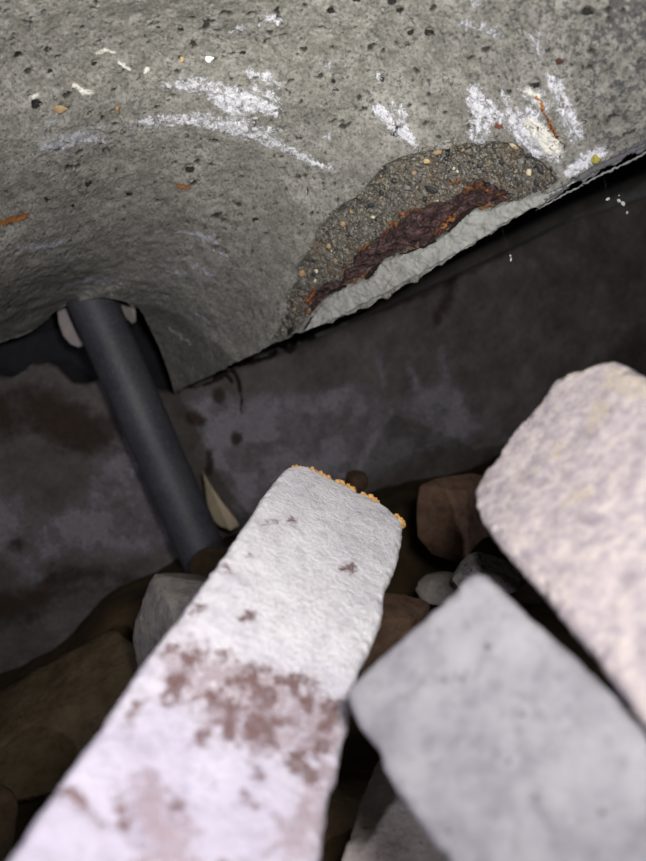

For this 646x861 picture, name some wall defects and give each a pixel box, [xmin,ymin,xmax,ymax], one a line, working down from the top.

efflorescence [465,73,608,179]
spalling [267,136,646,342]